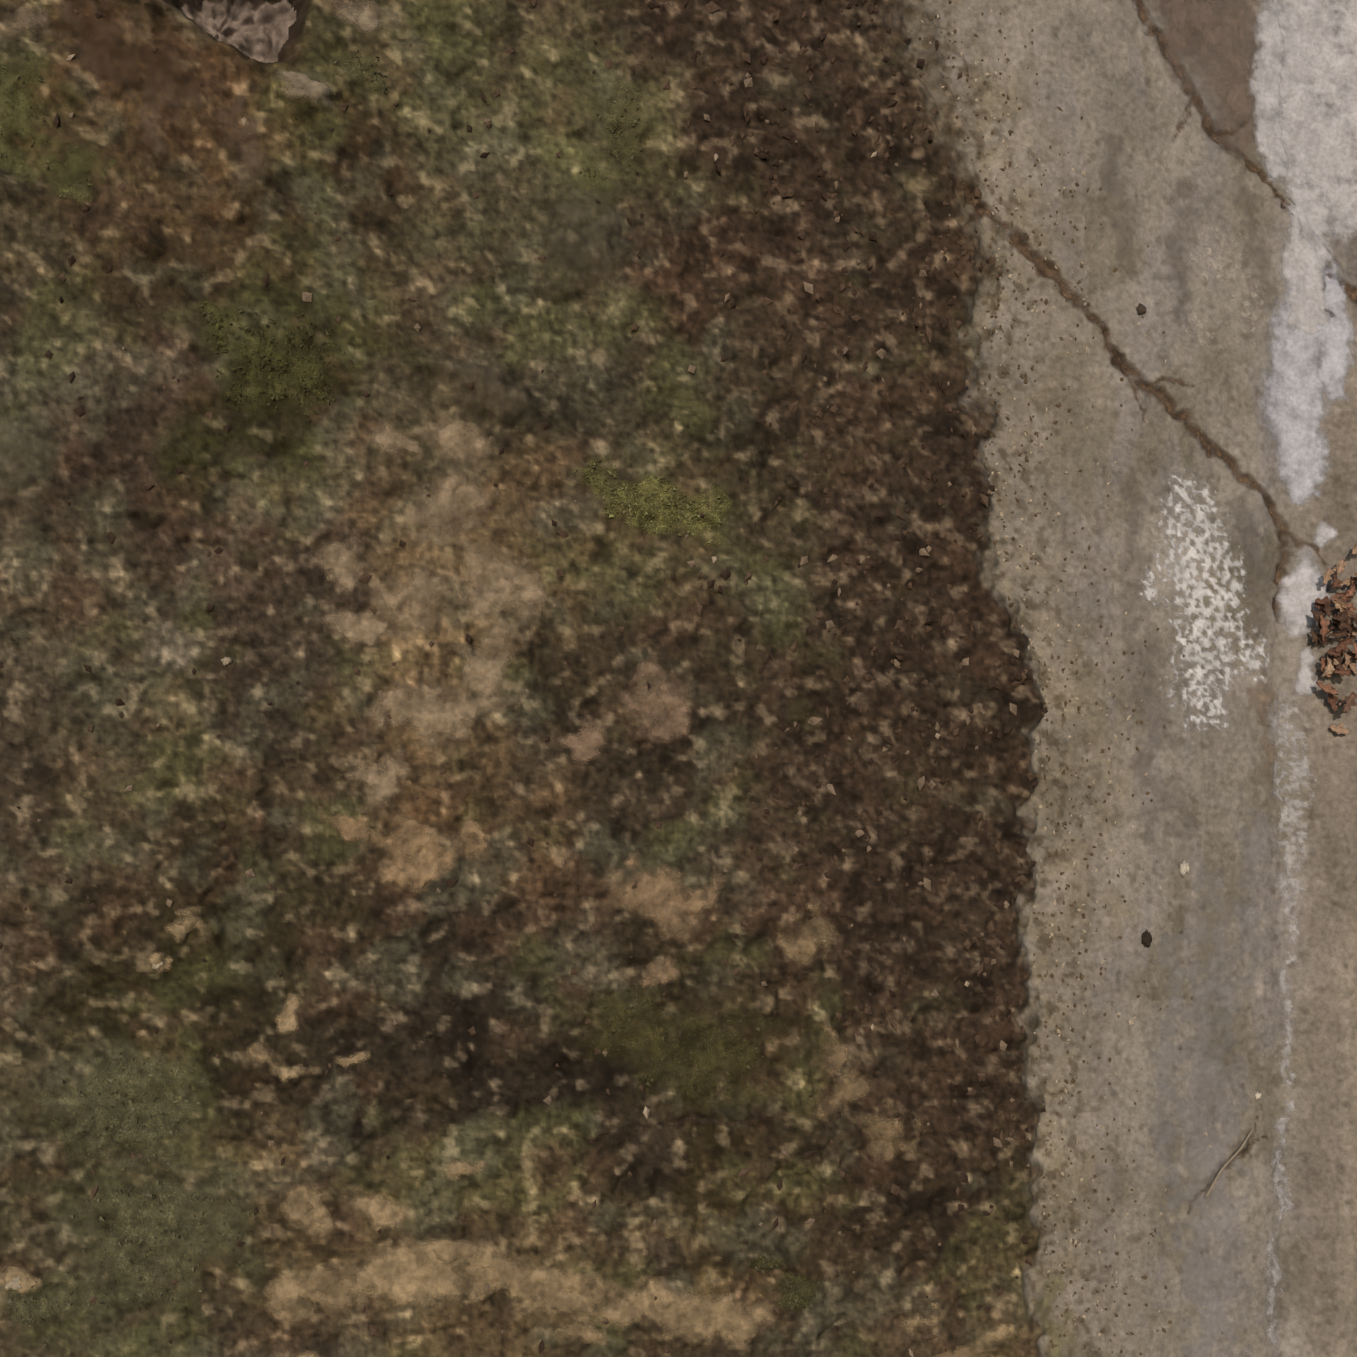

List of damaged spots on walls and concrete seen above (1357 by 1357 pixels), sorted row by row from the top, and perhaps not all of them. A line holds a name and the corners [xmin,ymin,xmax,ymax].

crack [1136,0,1293,215]
crack [947,176,1326,621]
leakage [1163,0,1357,505]
crack [1323,262,1357,314]
leakage [1140,476,1269,728]